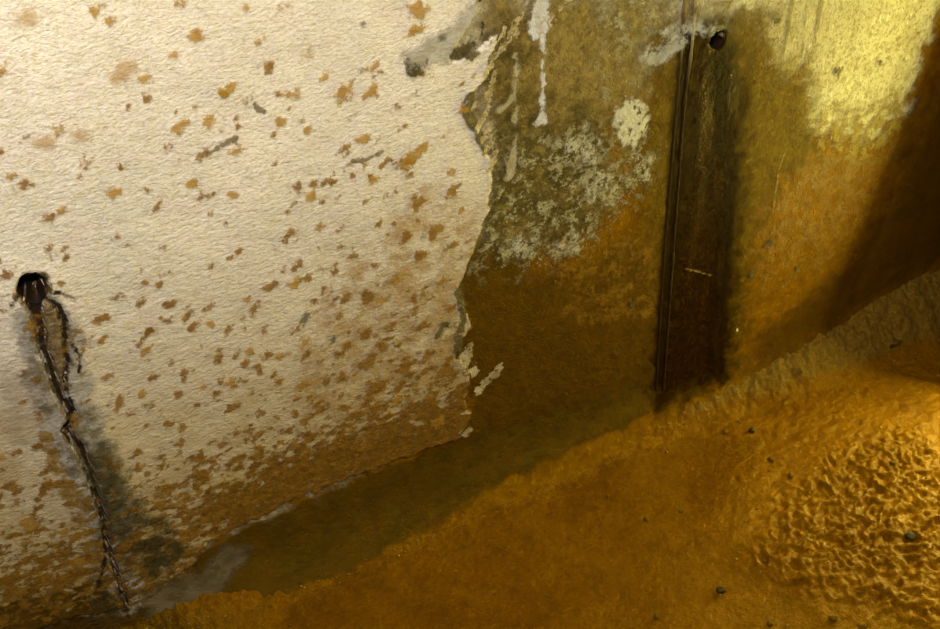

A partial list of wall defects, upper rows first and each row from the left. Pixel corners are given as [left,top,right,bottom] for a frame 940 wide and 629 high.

corrosion [406,0,430,36]
corrosion [218,82,236,98]
corrosion [334,62,383,105]
corrosion [285,134,428,214]
leakage [449,0,716,308]
corrosion [386,193,444,244]
corrosion [159,299,215,332]
peeling [0,0,524,616]
corrosion [262,259,338,291]
corrosion [201,345,290,414]
crack [10,281,131,616]
leakage [142,545,252,620]